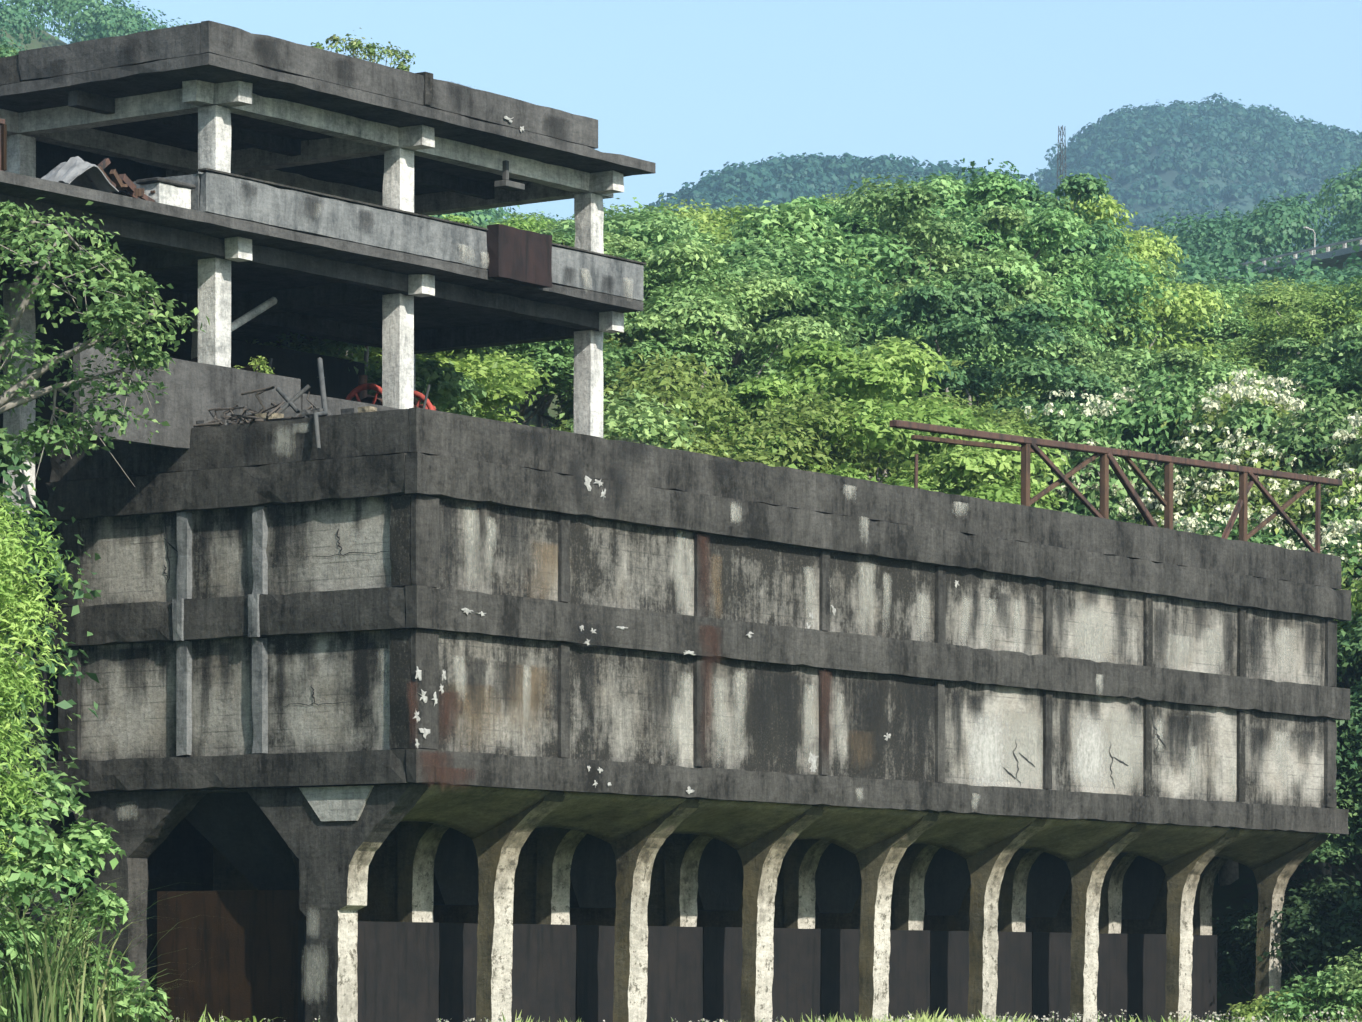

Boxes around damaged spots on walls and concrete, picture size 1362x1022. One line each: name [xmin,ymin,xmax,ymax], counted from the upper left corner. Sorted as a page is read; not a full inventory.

spalling [584,476,606,499]
crack [308,529,389,557]
water stain [861,566,889,616]
water stain [964,592,1033,630]
spalling [578,625,597,646]
water stain [1159,608,1231,664]
spalling [413,667,446,749]
water stain [718,673,744,721]
water stain [954,694,981,744]
crack [1003,740,1035,786]
water stain [1253,729,1286,763]